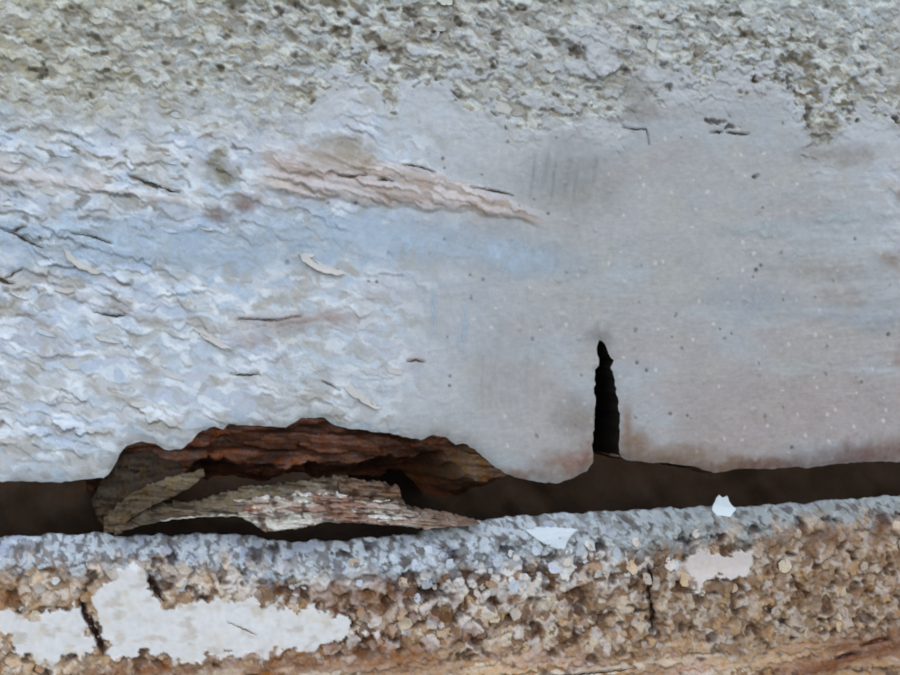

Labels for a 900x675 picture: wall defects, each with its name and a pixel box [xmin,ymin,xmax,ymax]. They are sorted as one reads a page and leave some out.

peeling [0,0,900,535]
crack [0,340,900,543]
peeling [0,495,900,675]